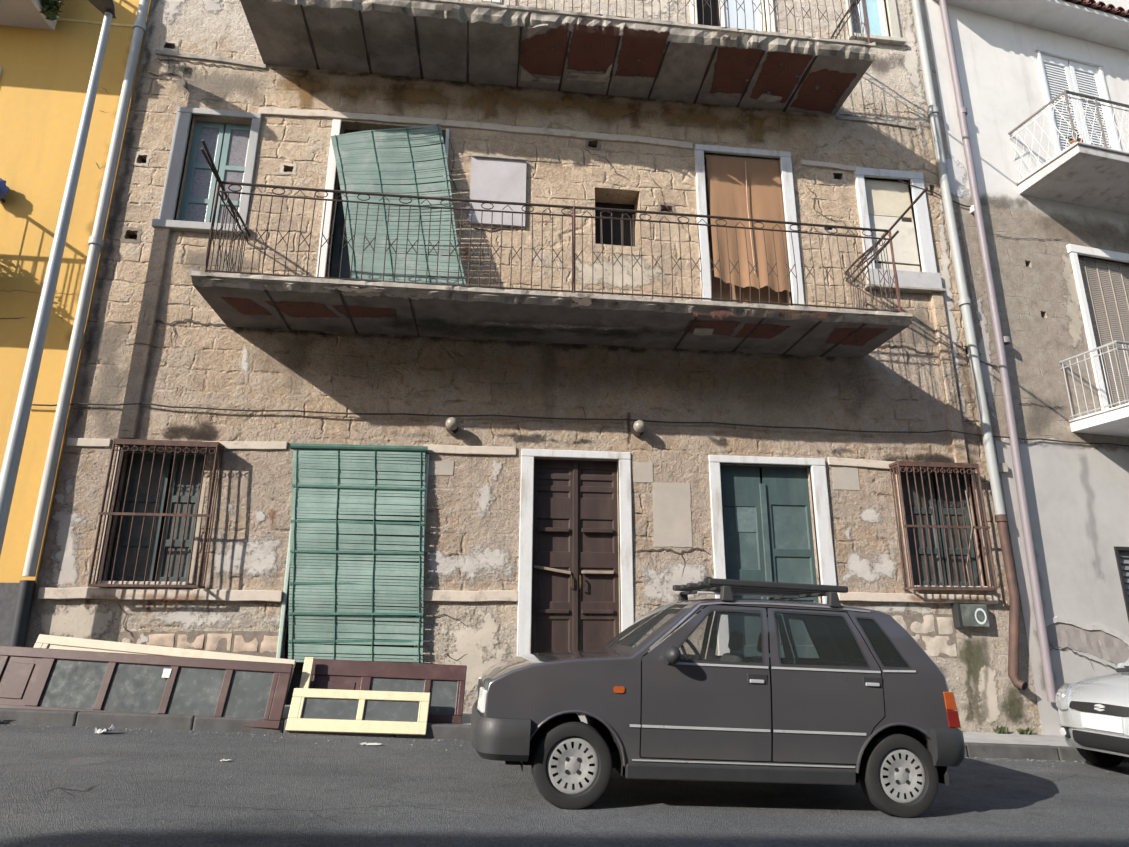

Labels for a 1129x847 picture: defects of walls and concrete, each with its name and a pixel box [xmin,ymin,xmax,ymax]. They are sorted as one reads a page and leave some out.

peeling [162,0,185,24]
spalling [520,0,684,83]
spalling [710,29,857,113]
peeling [49,479,87,587]
peeling [208,511,284,585]
peeling [427,540,517,585]
crack [635,548,710,576]
peeling [641,562,706,606]
flaking render [37,602,287,659]
peeling [432,609,509,701]
damp [966,640,988,720]
flaking render [1045,617,1129,665]